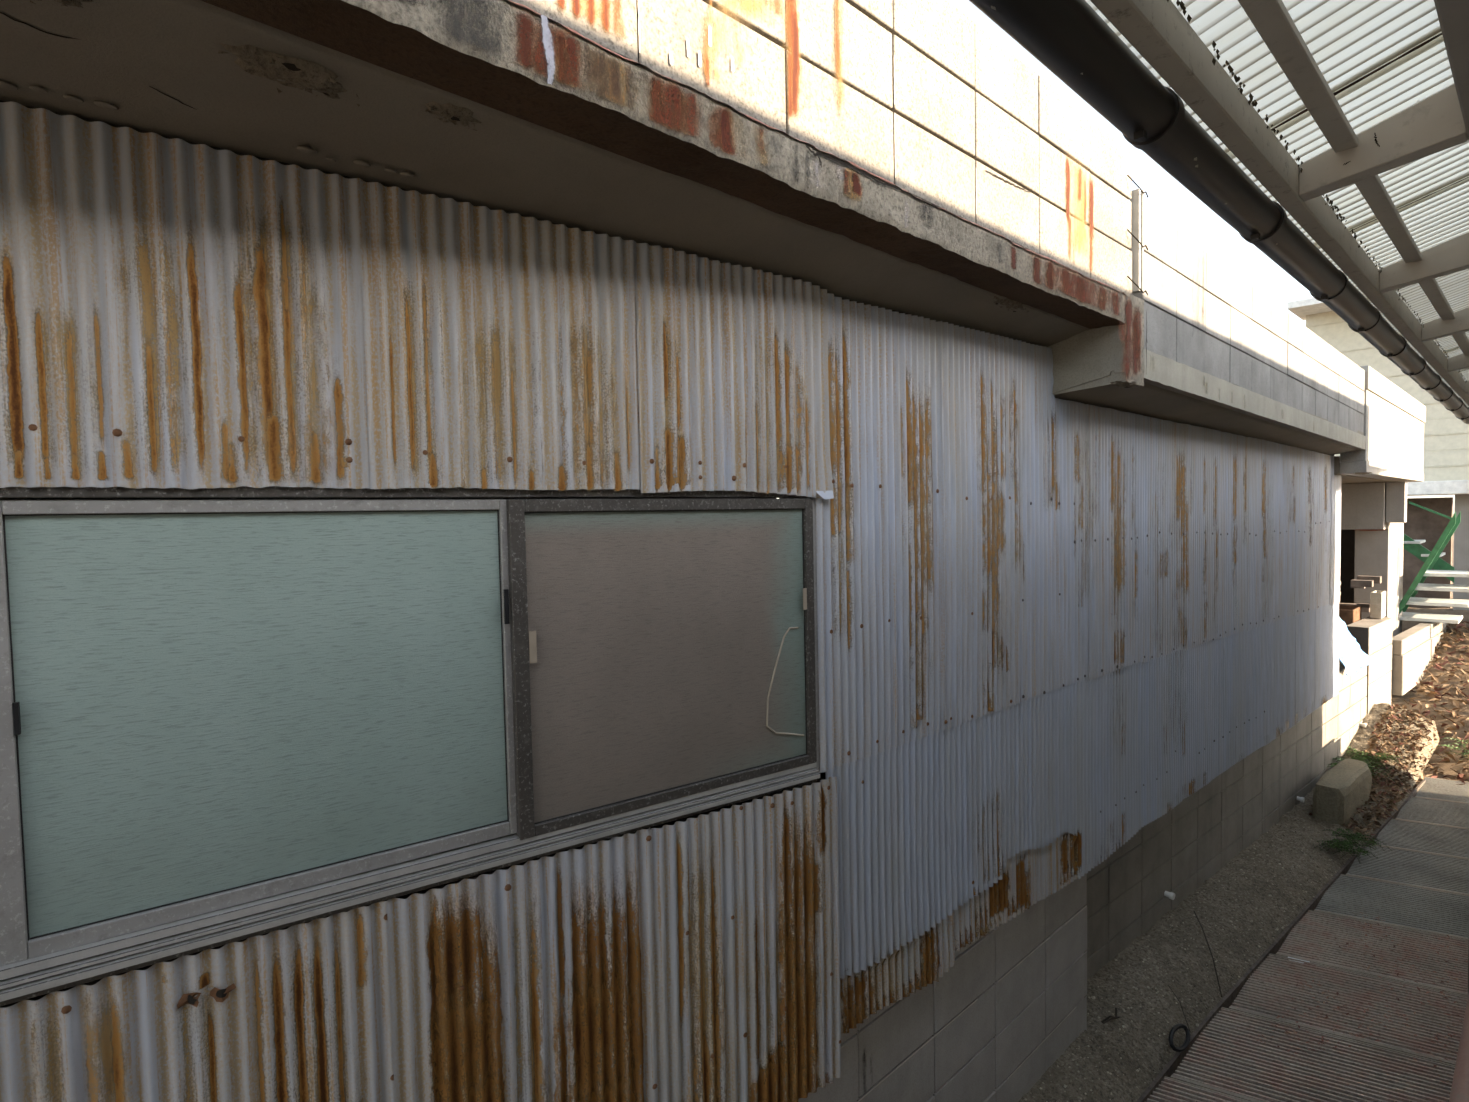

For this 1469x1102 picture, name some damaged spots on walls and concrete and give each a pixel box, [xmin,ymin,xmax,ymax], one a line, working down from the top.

rust [516,14,633,108]
rust [651,0,800,154]
rust [0,254,134,480]
rust [121,201,348,484]
rust [390,288,442,487]
rust [655,323,691,492]
rust [1011,158,1141,378]
rust [901,380,934,727]
rust [254,914,367,1102]
rust [427,870,644,1102]
rust [677,839,727,1102]
rust [747,786,829,1102]